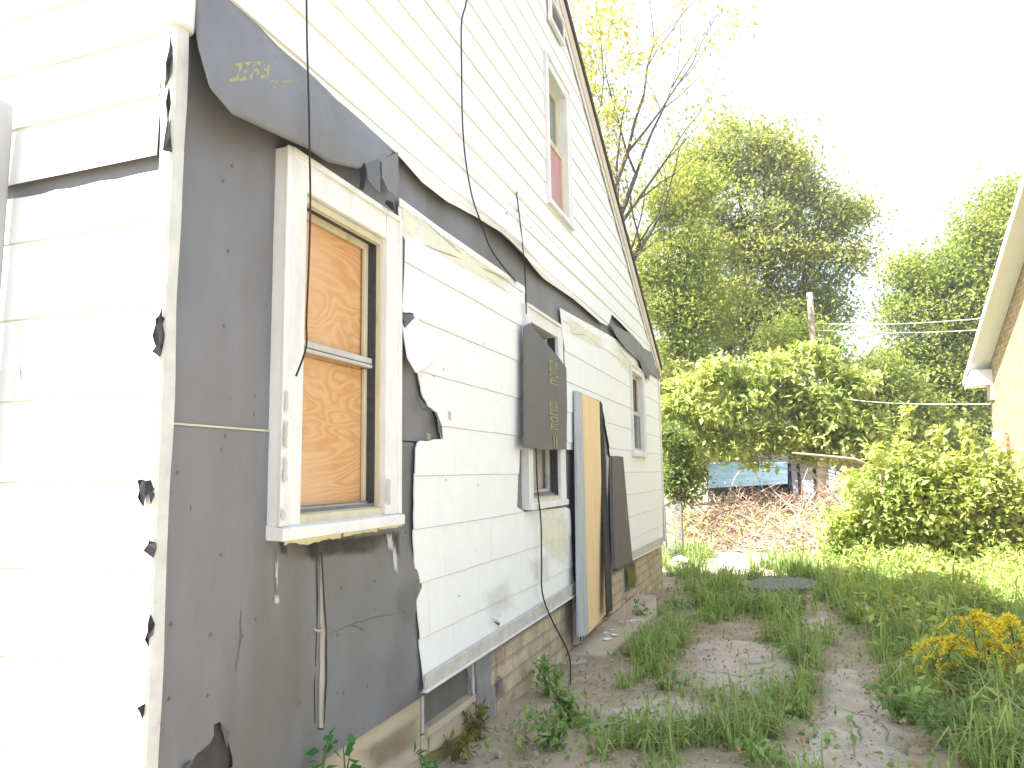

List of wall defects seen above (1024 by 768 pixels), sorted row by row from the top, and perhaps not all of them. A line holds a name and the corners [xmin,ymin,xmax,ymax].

leakage [543,518,567,559]